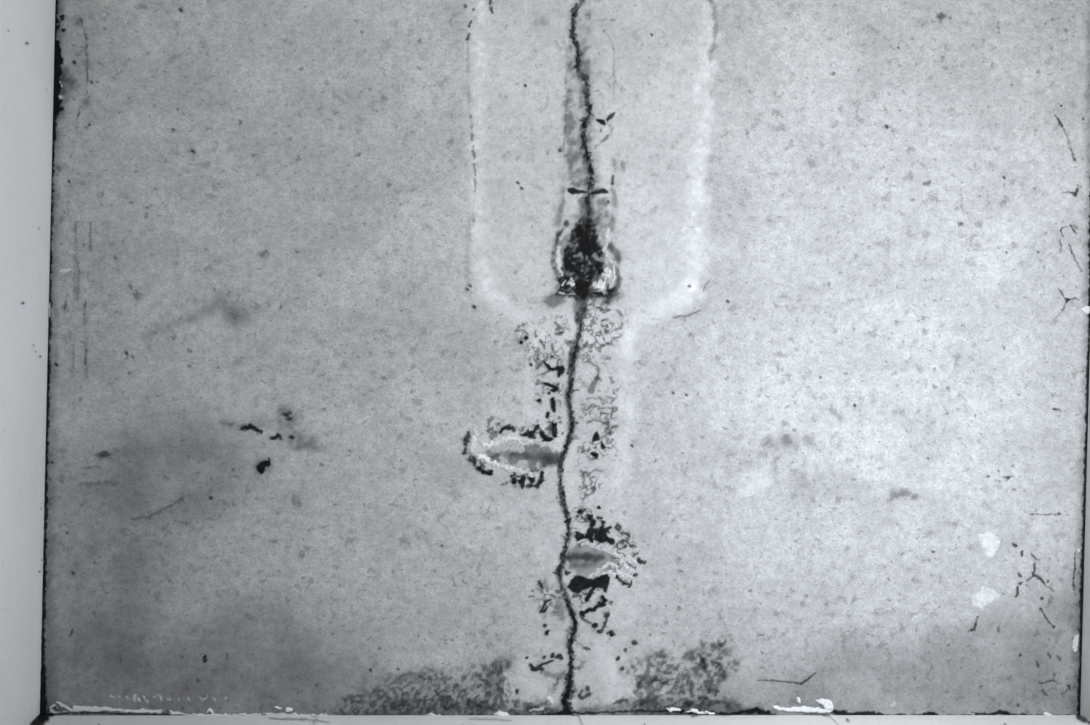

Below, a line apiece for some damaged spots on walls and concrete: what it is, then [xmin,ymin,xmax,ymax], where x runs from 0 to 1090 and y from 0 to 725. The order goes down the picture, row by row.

crack [569,3,615,242]
water stain [552,115,620,301]
water stain [256,458,271,474]
water stain [240,423,294,440]
spalling [462,419,564,489]
crack [541,288,775,717]
spalling [565,505,647,637]
water stain [341,664,554,715]
water stain [616,641,730,714]
peeling [772,697,834,715]